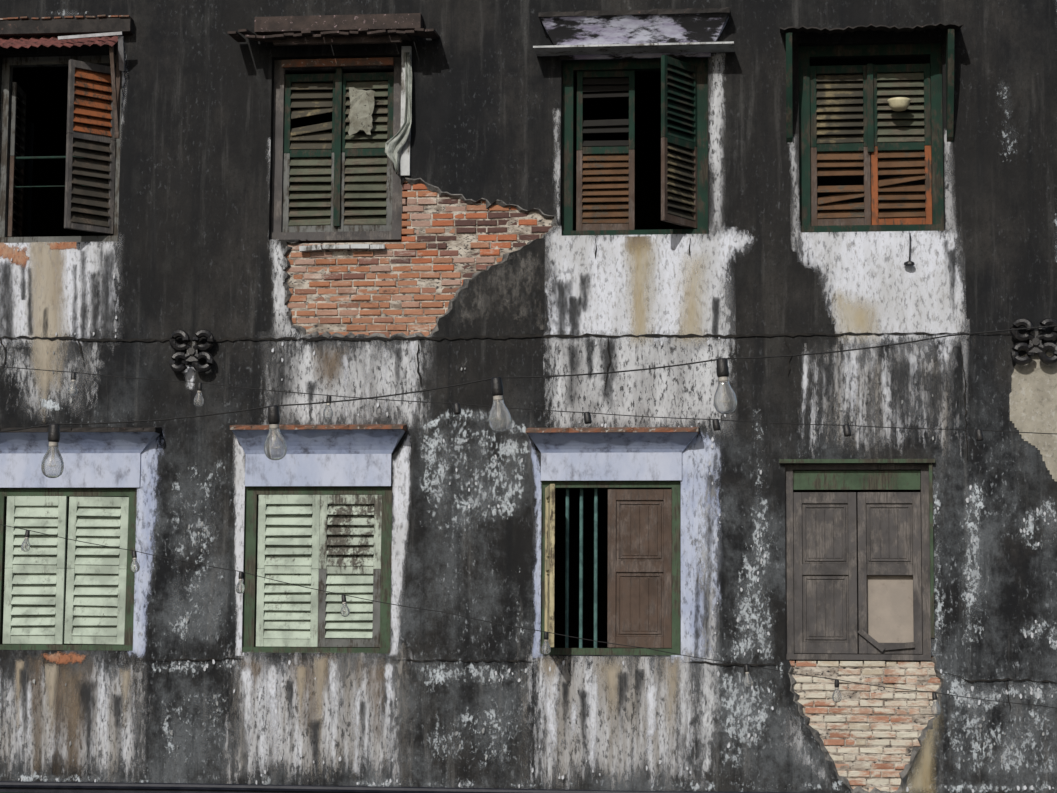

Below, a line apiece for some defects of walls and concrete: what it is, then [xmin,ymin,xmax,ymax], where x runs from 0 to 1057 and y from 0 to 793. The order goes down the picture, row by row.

leakage [30,242,64,399]
peeling [0,242,119,414]
peeling [264,52,1057,793]
peeling [0,437,163,782]
peeling [152,436,412,787]